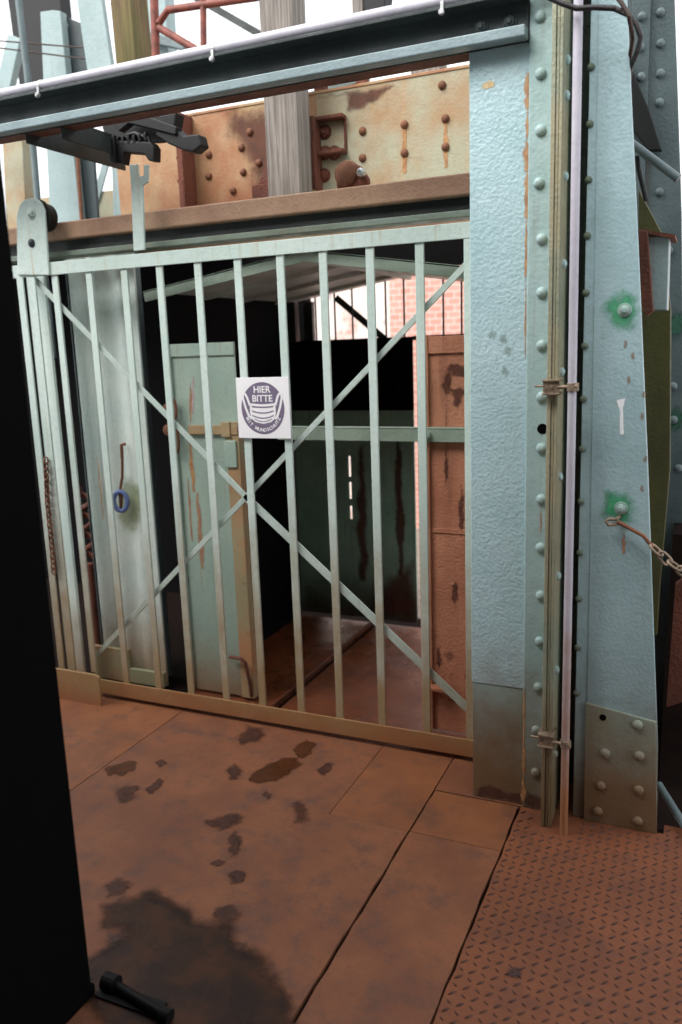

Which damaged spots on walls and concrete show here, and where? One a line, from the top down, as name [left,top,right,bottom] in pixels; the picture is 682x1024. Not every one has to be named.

rust [348,87,390,109]
rust [231,114,267,181]
rust [442,364,464,406]
rust [188,434,204,568]
rust [356,448,369,581]
rust [383,442,415,617]
water stain [238,727,264,744]
water stain [105,760,167,802]
water stain [226,740,315,799]
water stain [318,763,333,775]
water stain [205,813,245,883]
water stain [214,905,238,924]